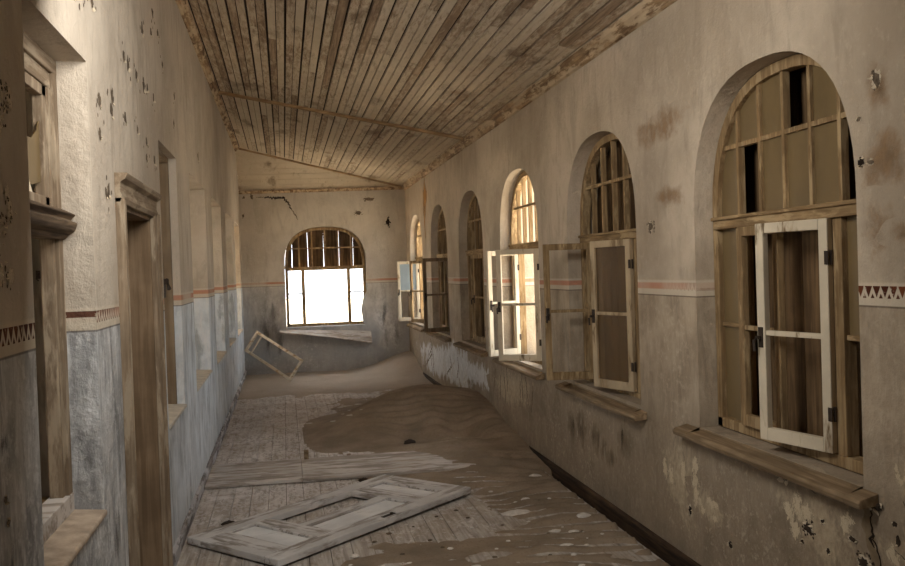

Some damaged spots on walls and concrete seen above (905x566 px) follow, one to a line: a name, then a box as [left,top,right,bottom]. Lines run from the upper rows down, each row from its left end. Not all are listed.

flaking render [122,41,156,106]
flaking render [868,68,881,91]
flaking render [96,88,157,169]
damp [856,37,905,277]
crack [258,196,298,220]
peeling [413,335,496,397]
peeling [758,471,905,566]
crack [859,508,905,566]